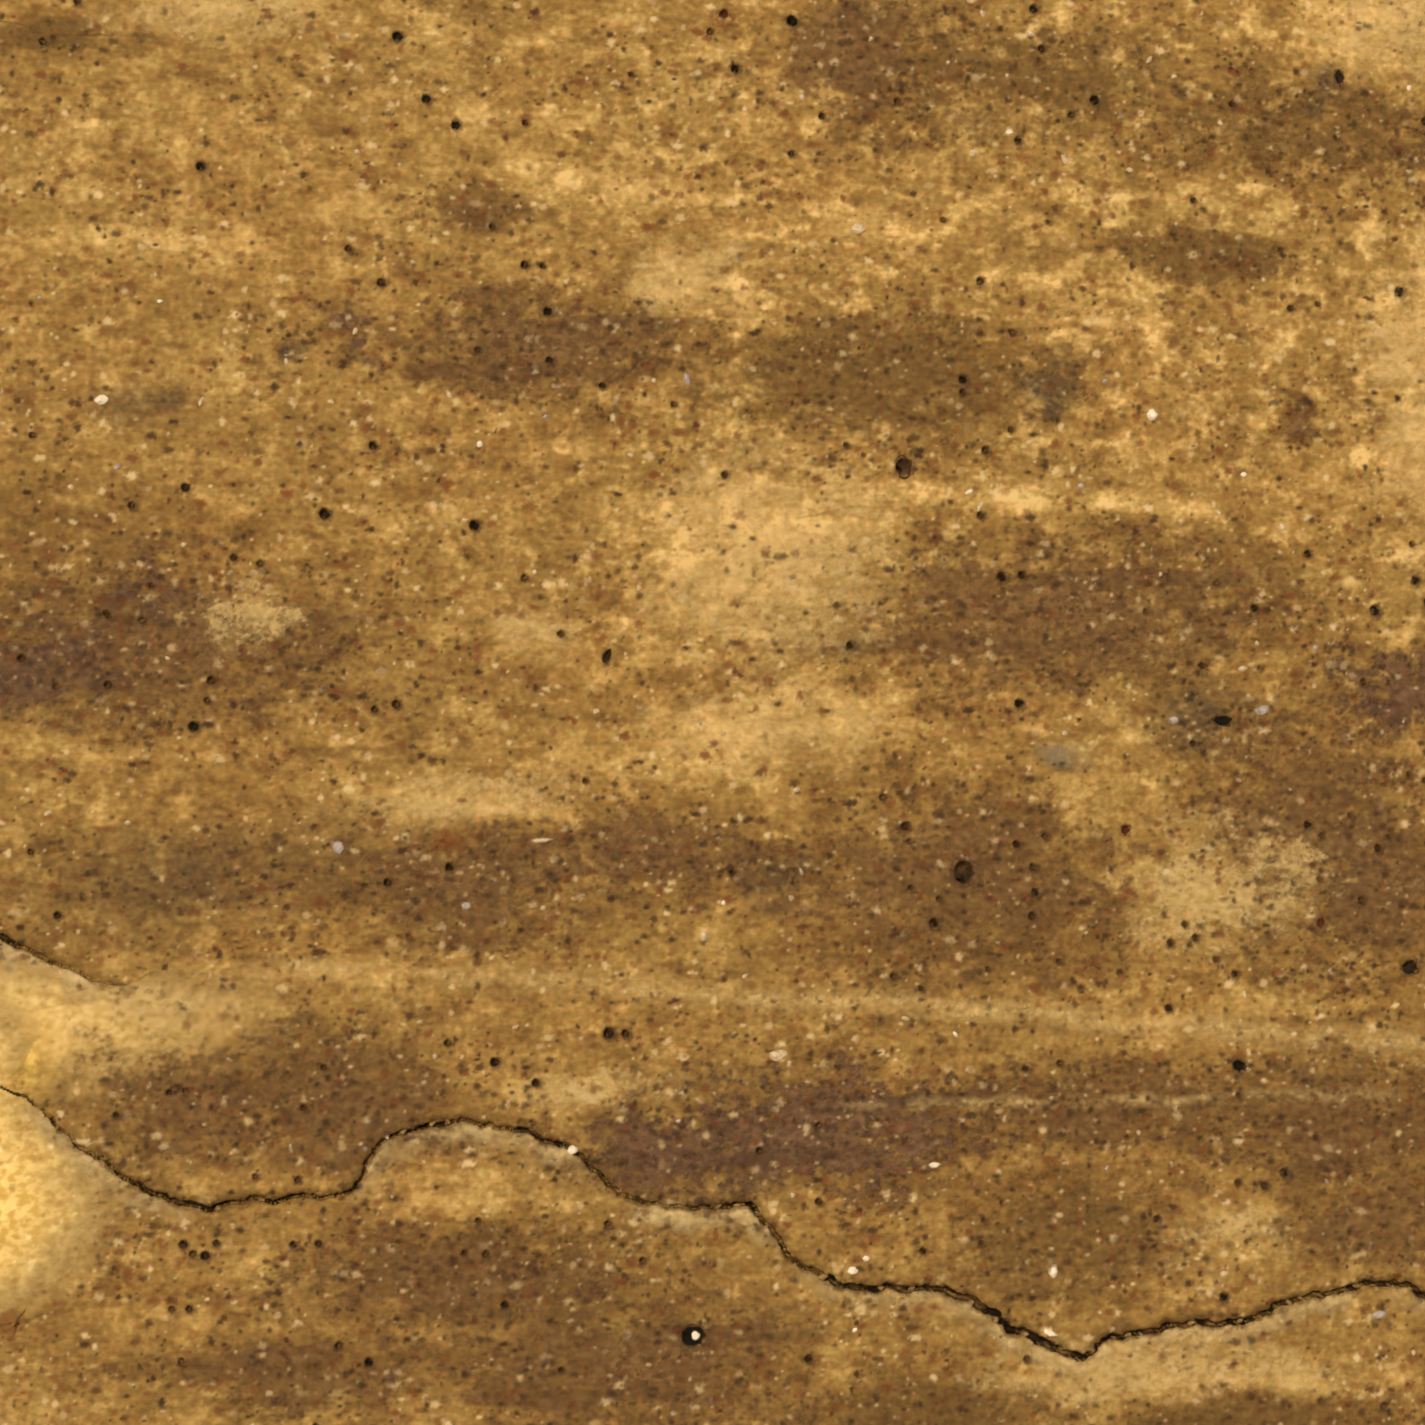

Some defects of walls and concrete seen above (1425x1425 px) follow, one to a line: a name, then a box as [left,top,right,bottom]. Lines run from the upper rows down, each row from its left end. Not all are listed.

crack [0,931,219,1004]
crack [0,1086,1425,1397]